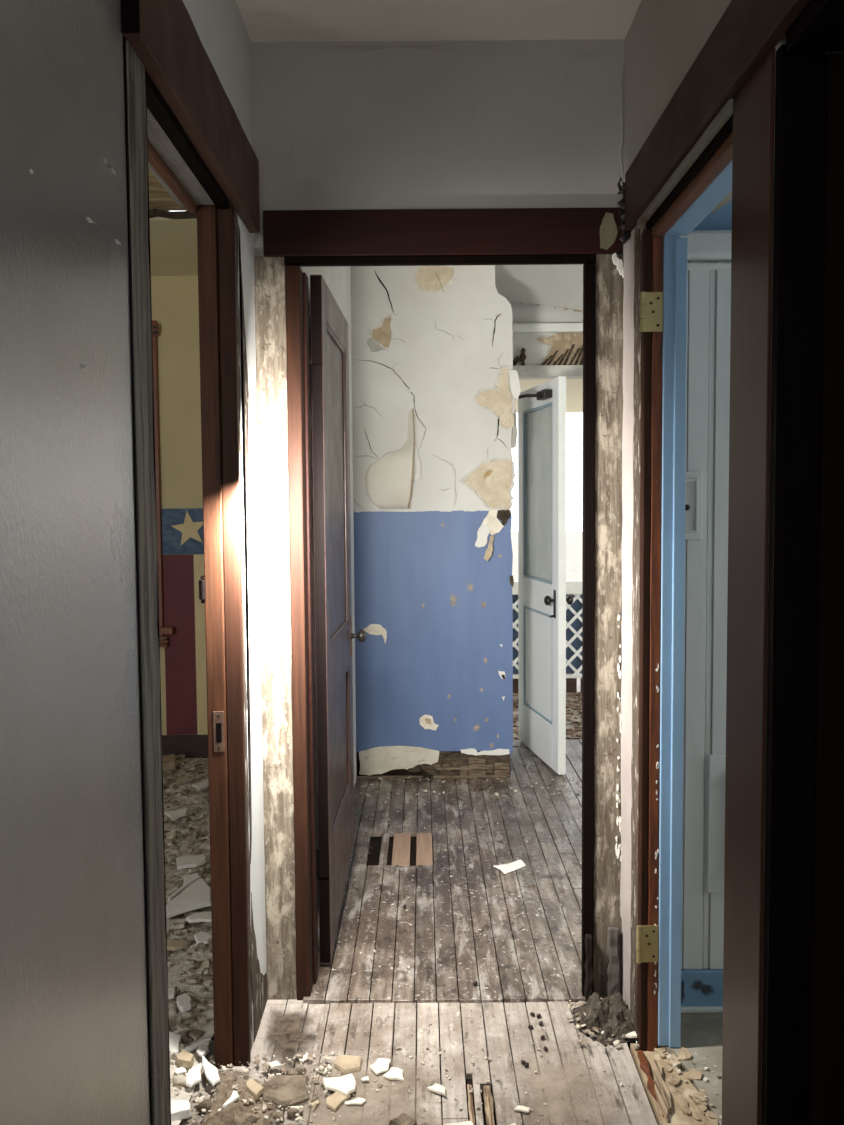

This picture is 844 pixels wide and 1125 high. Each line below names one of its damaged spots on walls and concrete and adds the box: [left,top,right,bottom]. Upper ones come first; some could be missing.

flaking render [413,265,457,294]
flaking render [367,313,396,352]
crack [434,313,503,370]
crack [354,270,458,508]
flaking render [355,322,583,561]
crack [486,418,509,460]
peeling [362,624,387,642]
peeling [419,715,439,731]
flaking render [356,746,511,780]